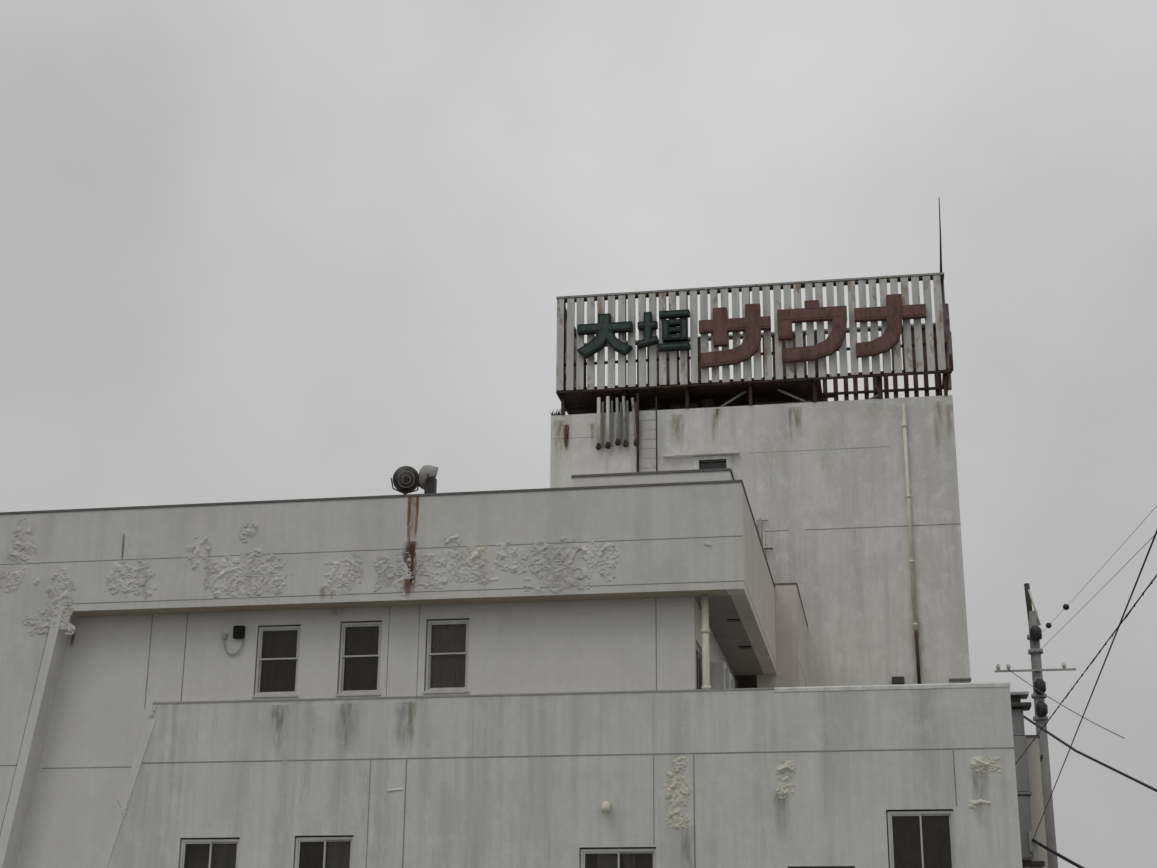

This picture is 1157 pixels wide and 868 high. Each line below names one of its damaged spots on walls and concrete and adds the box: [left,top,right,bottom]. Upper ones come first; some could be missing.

rust [404,496,419,592]